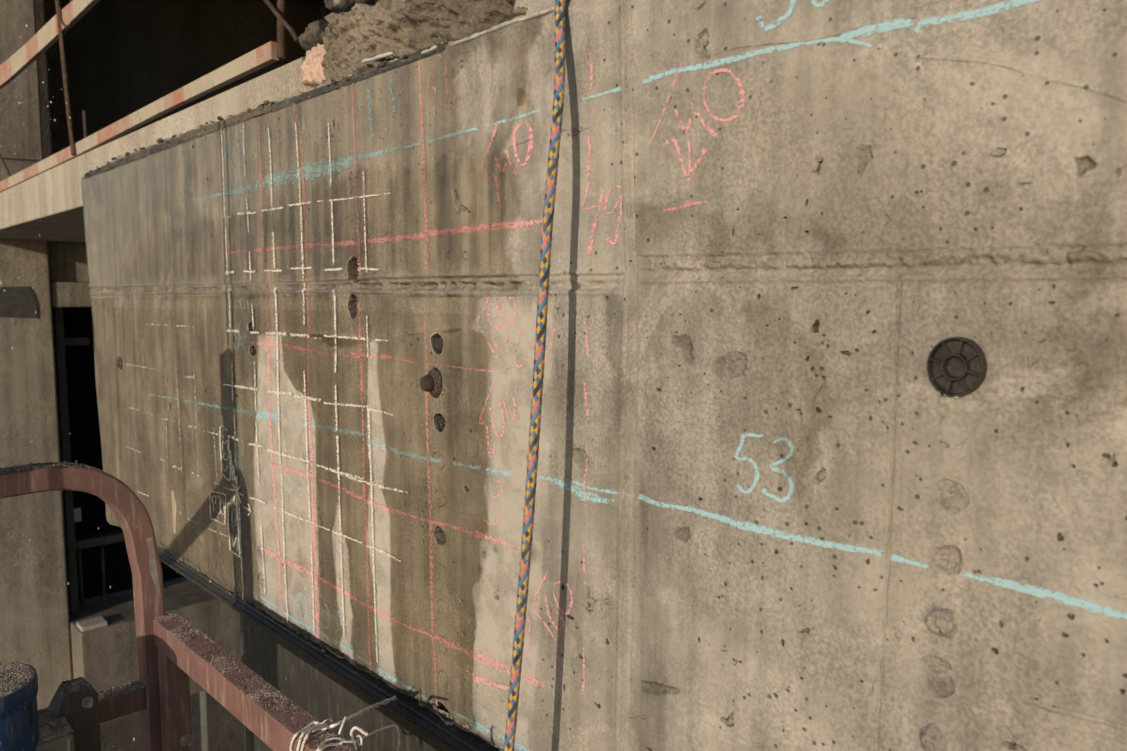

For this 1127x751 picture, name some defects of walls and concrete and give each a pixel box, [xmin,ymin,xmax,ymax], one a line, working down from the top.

spalling [83,0,529,179]
damp [81,116,300,401]
damp [491,305,551,377]
damp [369,374,383,424]
damp [254,341,319,595]
damp [486,368,548,572]
damp [254,564,318,639]
damp [368,494,391,626]
damp [365,645,394,675]
damp [476,599,536,688]
damp [529,566,538,614]